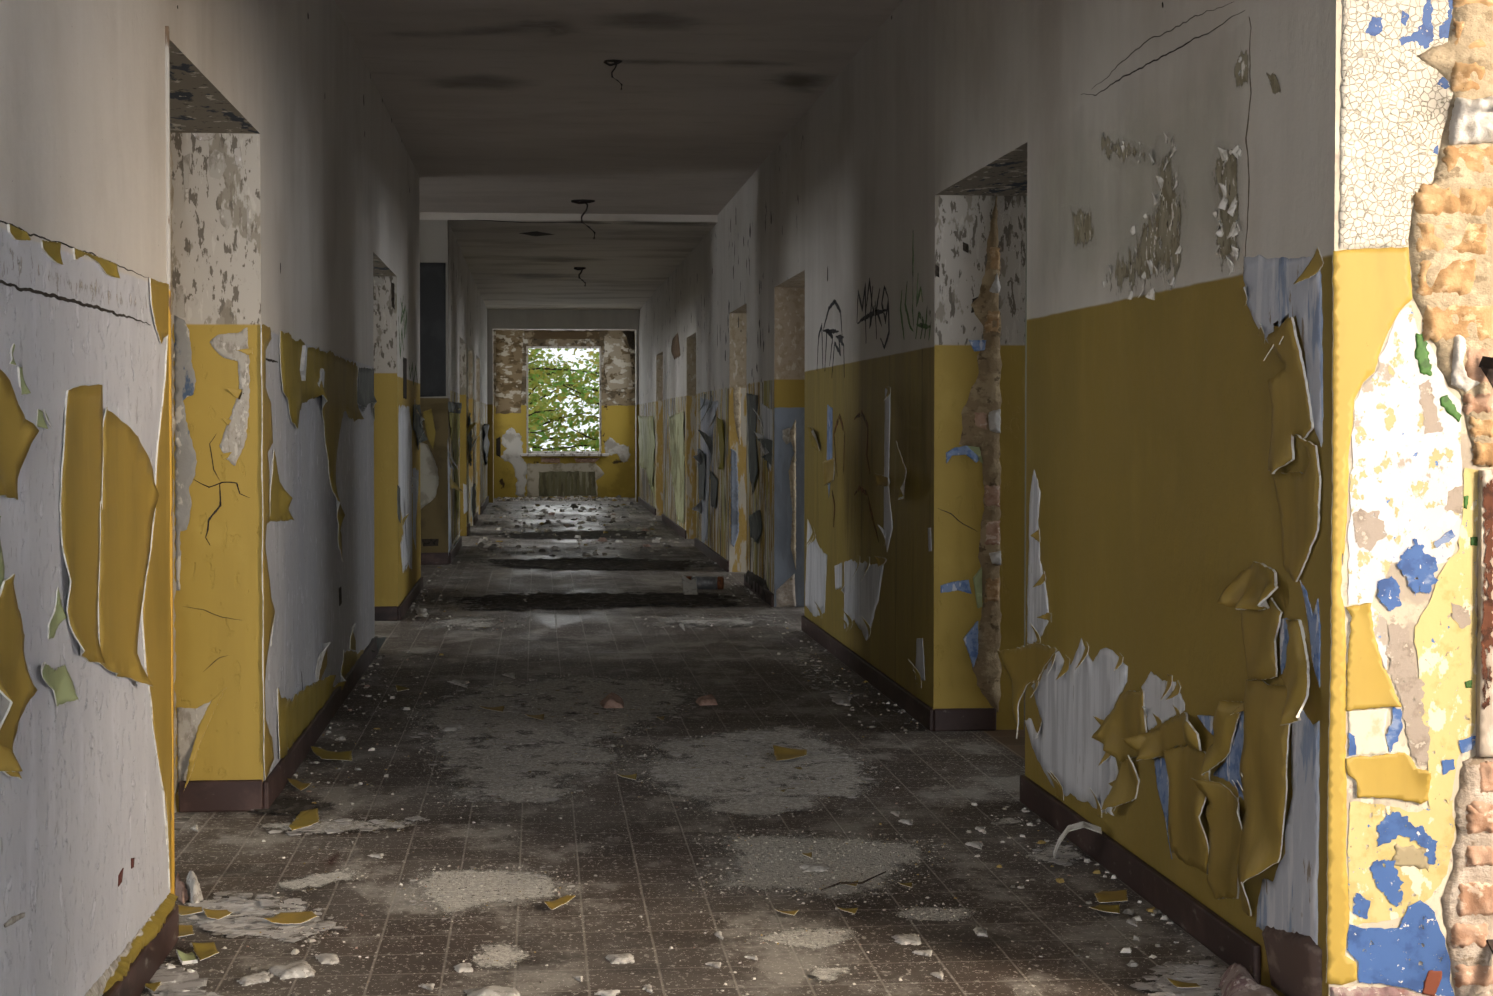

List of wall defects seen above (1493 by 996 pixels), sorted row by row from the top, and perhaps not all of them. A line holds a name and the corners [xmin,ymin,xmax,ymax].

crack [0,220,149,278]
crack [0,280,150,325]
peeling [0,132,243,996]
crack [194,435,249,546]
peeling [210,324,386,780]
peeling [397,320,907,641]
peeling [940,0,1493,996]
peeling [908,638,925,688]
peeling [289,808,320,831]